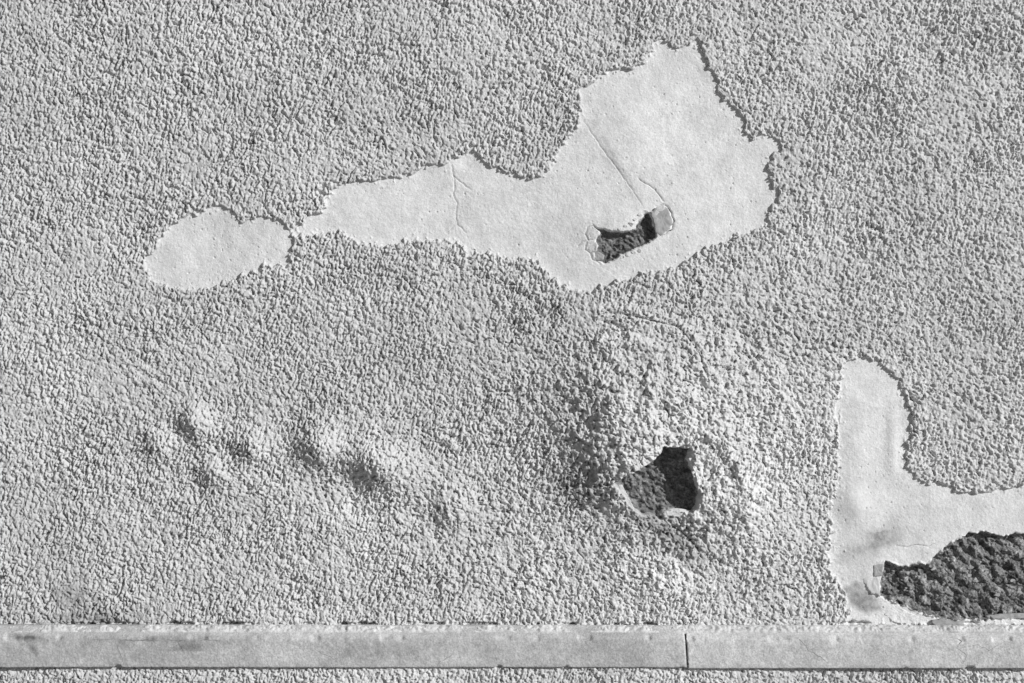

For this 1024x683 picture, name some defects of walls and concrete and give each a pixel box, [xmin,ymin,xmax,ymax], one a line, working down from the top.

flaking render [145,39,781,294]
spalling [615,446,702,517]
flaking render [828,354,1024,625]